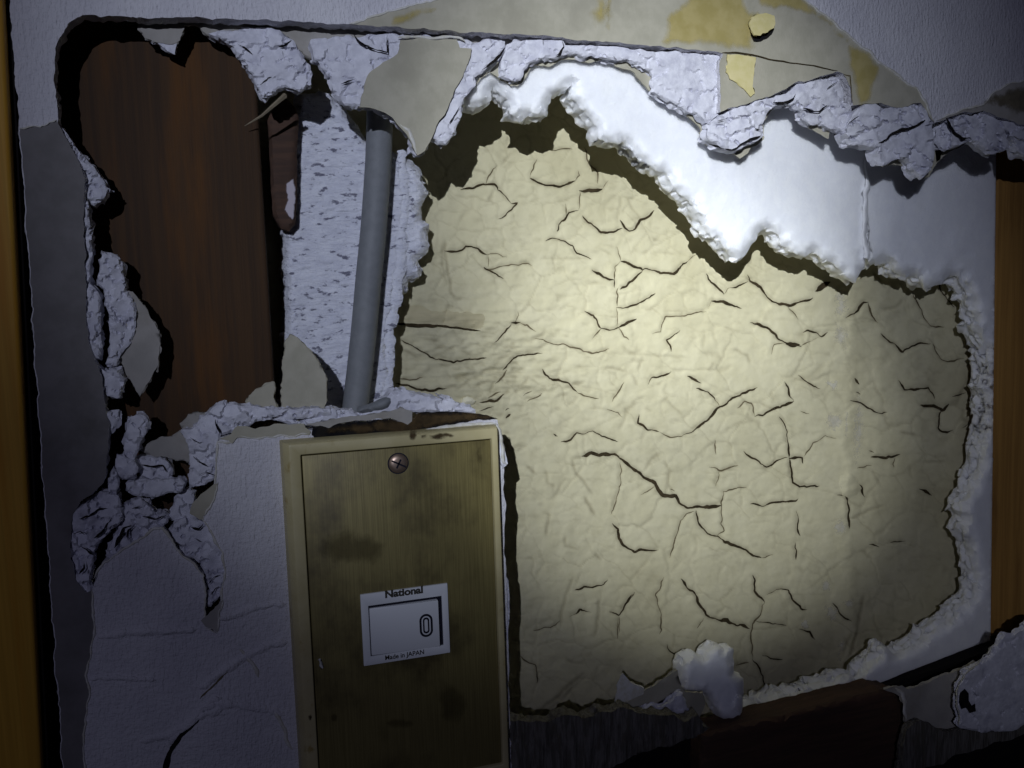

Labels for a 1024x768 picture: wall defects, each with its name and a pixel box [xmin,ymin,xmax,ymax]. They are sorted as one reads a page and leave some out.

spalling [146,40,178,55]
peeling [748,13,775,36]
spalling [208,27,1024,181]
spalling [62,128,476,607]
spalling [615,673,689,714]
spalling [953,621,1024,733]